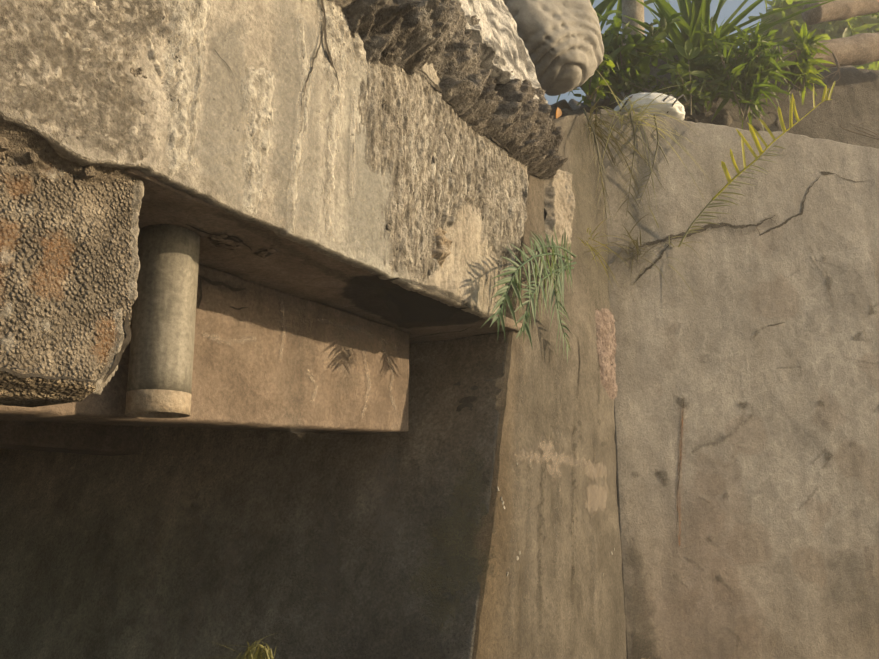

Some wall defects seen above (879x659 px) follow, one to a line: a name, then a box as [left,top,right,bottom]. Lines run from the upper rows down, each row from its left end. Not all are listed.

crack [303,0,342,113]
peeling [356,61,529,294]
crack [632,171,864,283]